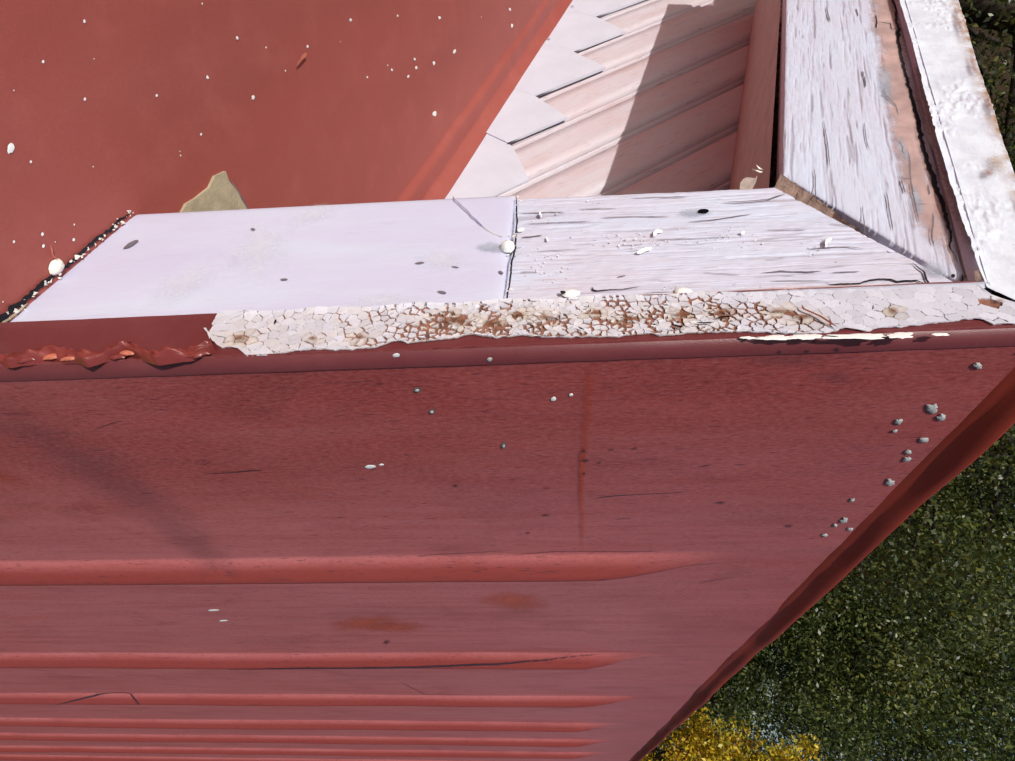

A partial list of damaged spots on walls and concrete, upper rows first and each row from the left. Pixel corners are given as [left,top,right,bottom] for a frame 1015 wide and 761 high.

crack [814,124,830,201]
crack [856,0,967,281]
peeling [204,207,1015,357]
crack [706,206,930,285]